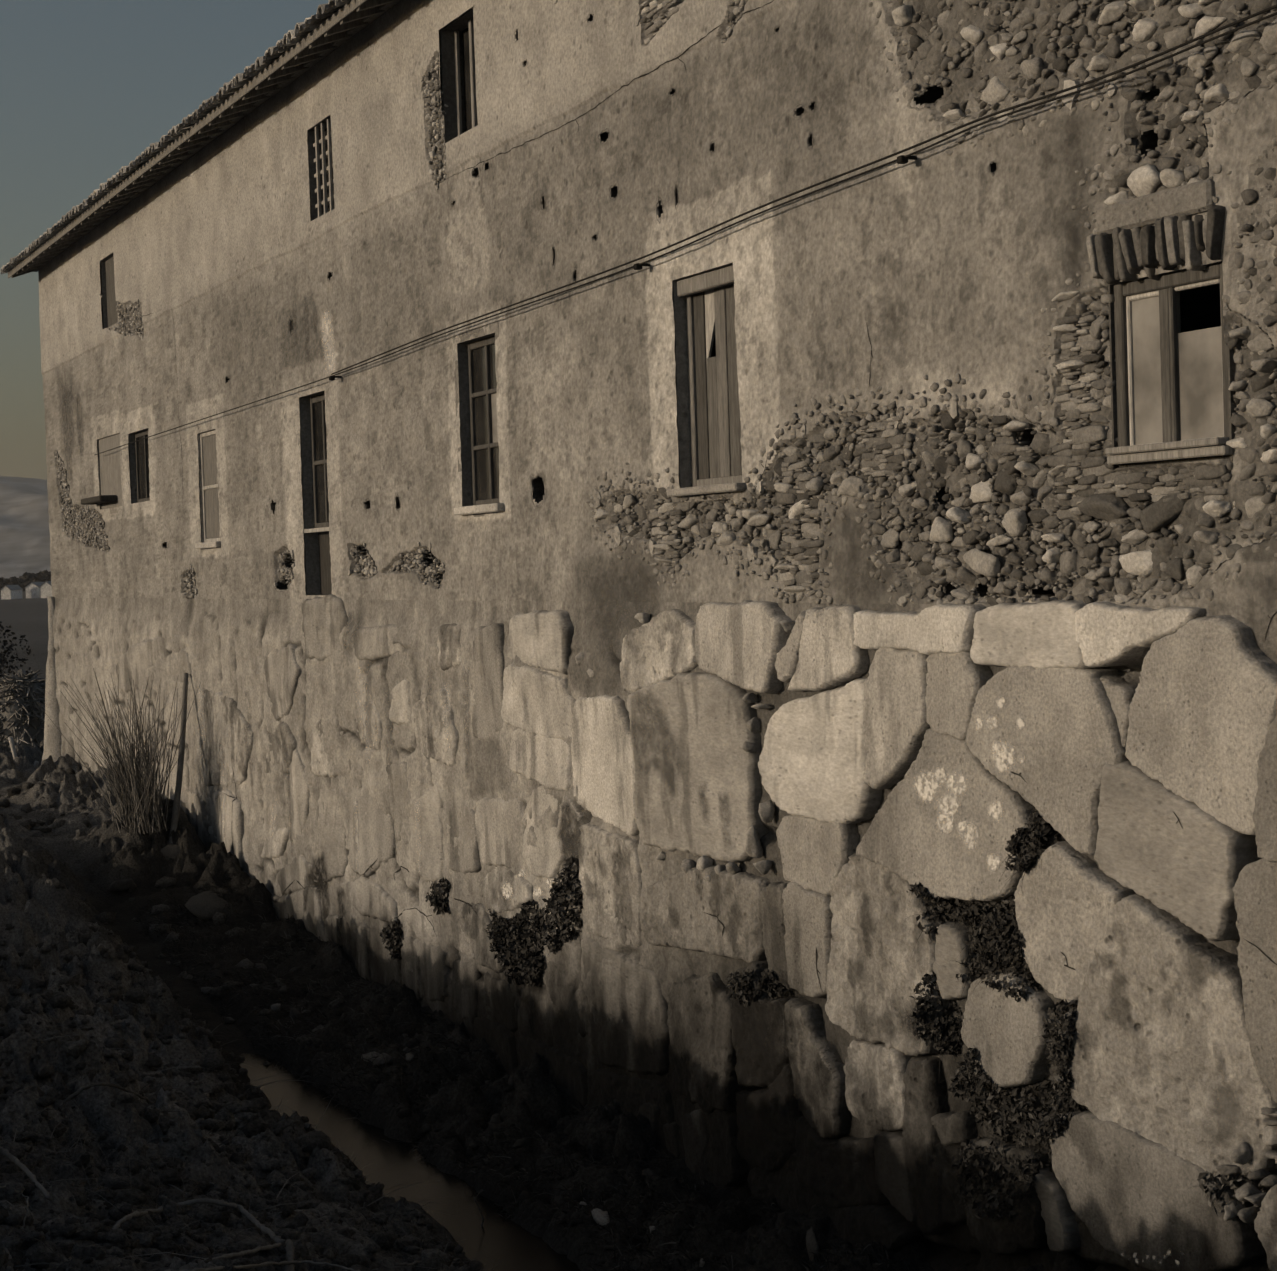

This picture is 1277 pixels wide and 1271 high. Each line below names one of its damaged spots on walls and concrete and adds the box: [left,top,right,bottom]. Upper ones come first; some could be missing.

spalling [420,51,448,190]
spalling [107,299,144,340]
spalling [586,0,1277,608]
spalling [54,450,110,552]
spalling [273,546,295,588]
spalling [347,542,445,589]